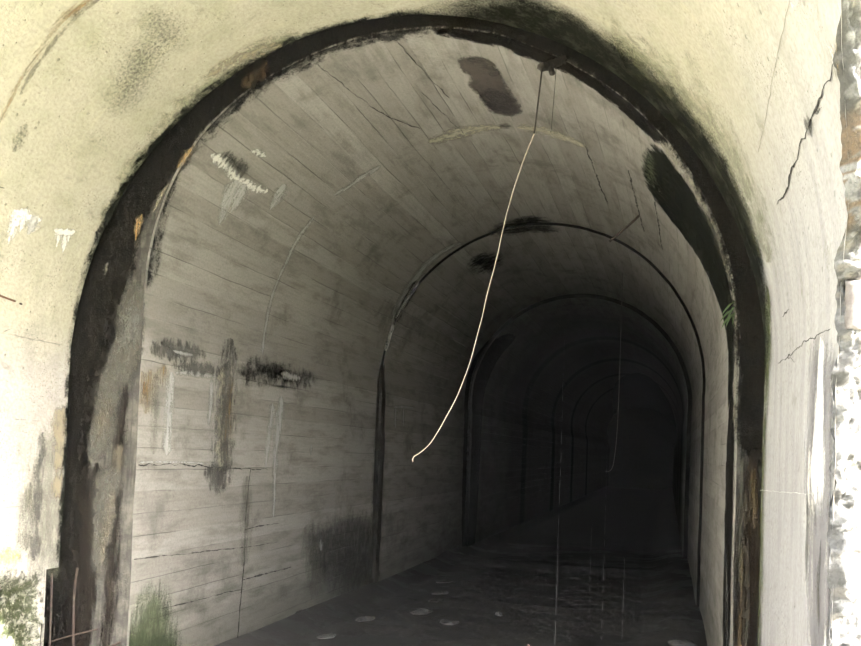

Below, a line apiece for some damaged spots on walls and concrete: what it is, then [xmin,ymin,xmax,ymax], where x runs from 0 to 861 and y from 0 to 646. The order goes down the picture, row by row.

corrosion [1,0,99,119]
damp [80,91,211,285]
damp [202,17,381,93]
damp [428,0,769,380]
crack [777,64,833,204]
damp [73,296,81,331]
damp [152,216,315,517]
crack [778,329,830,364]
damp [56,473,66,575]
damp [99,383,128,646]
damp [723,316,736,646]
corrosion [733,457,762,646]